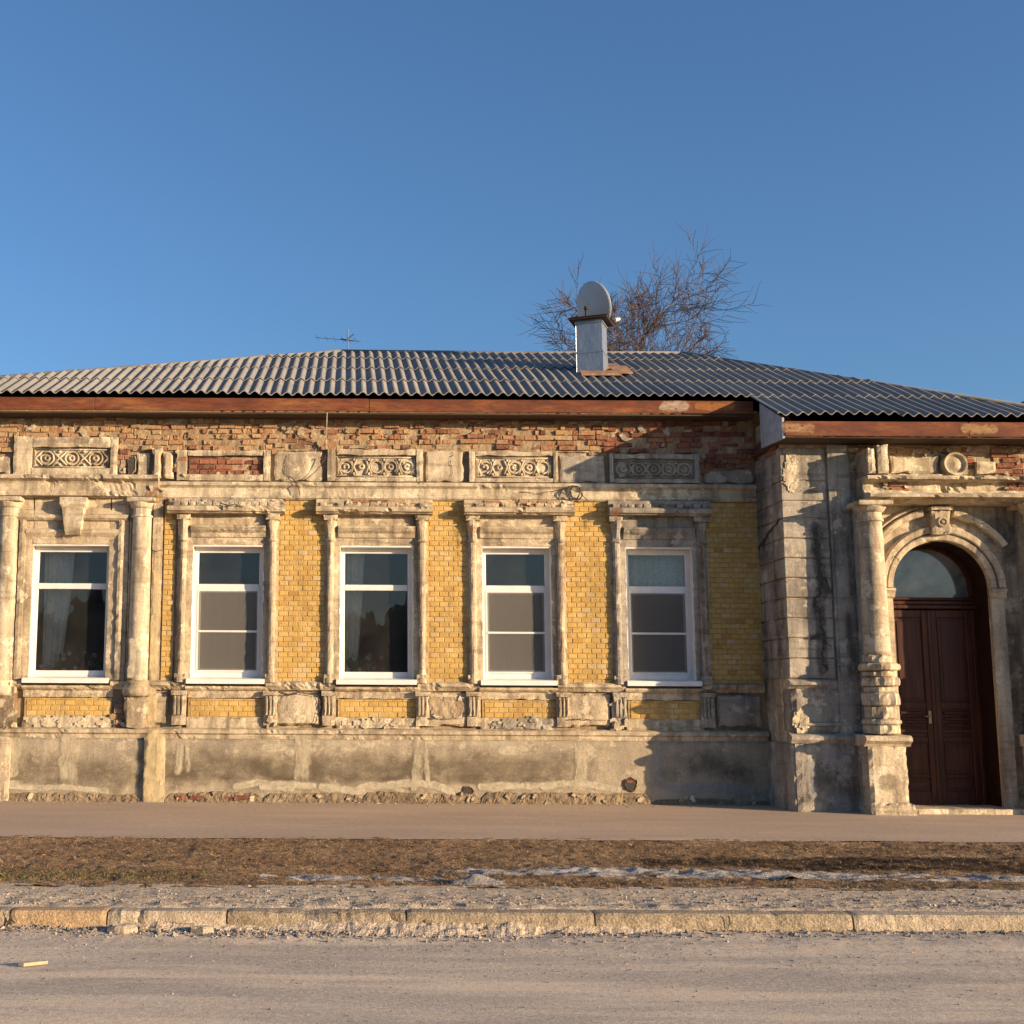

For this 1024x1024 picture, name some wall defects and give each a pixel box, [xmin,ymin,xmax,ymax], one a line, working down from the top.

flaking render [0,401,799,492]
flaking render [847,424,1024,491]
crack [758,519,779,553]